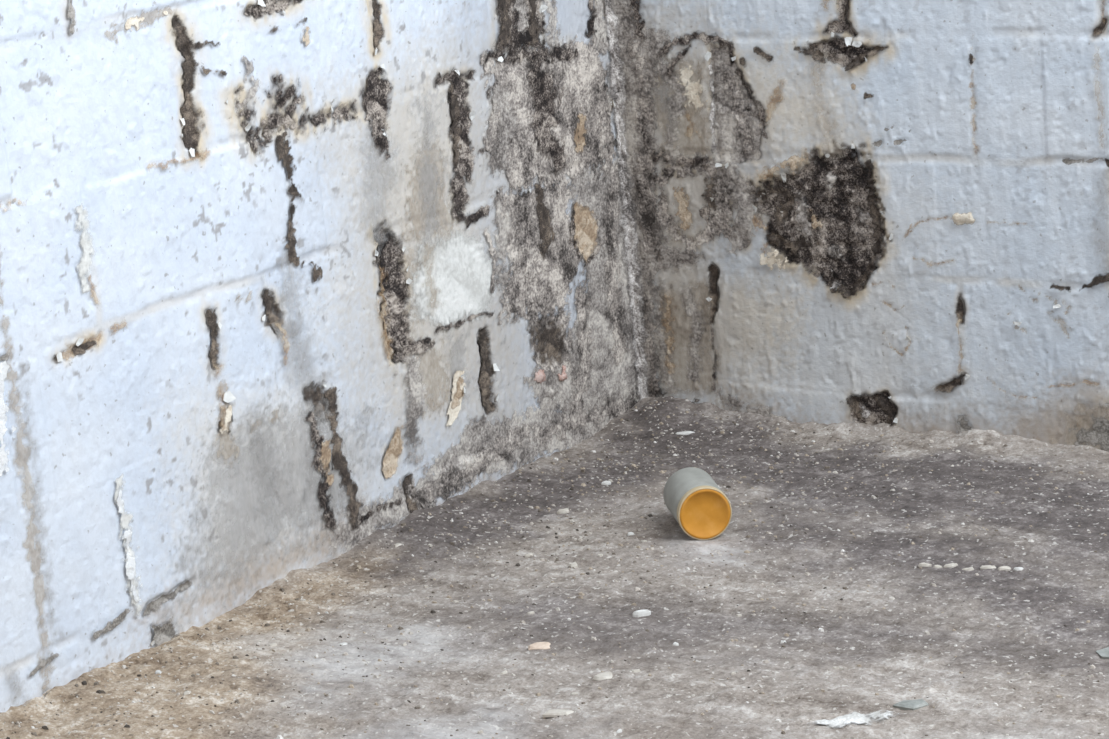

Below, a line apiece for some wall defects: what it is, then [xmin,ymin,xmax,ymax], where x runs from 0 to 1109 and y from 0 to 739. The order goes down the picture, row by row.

spalling [244,0,303,32]
spalling [238,56,259,109]
spalling [657,31,975,299]
leakage [304,0,792,552]
peeling [0,353,17,476]
spalling [373,220,435,479]
spalling [846,392,898,426]